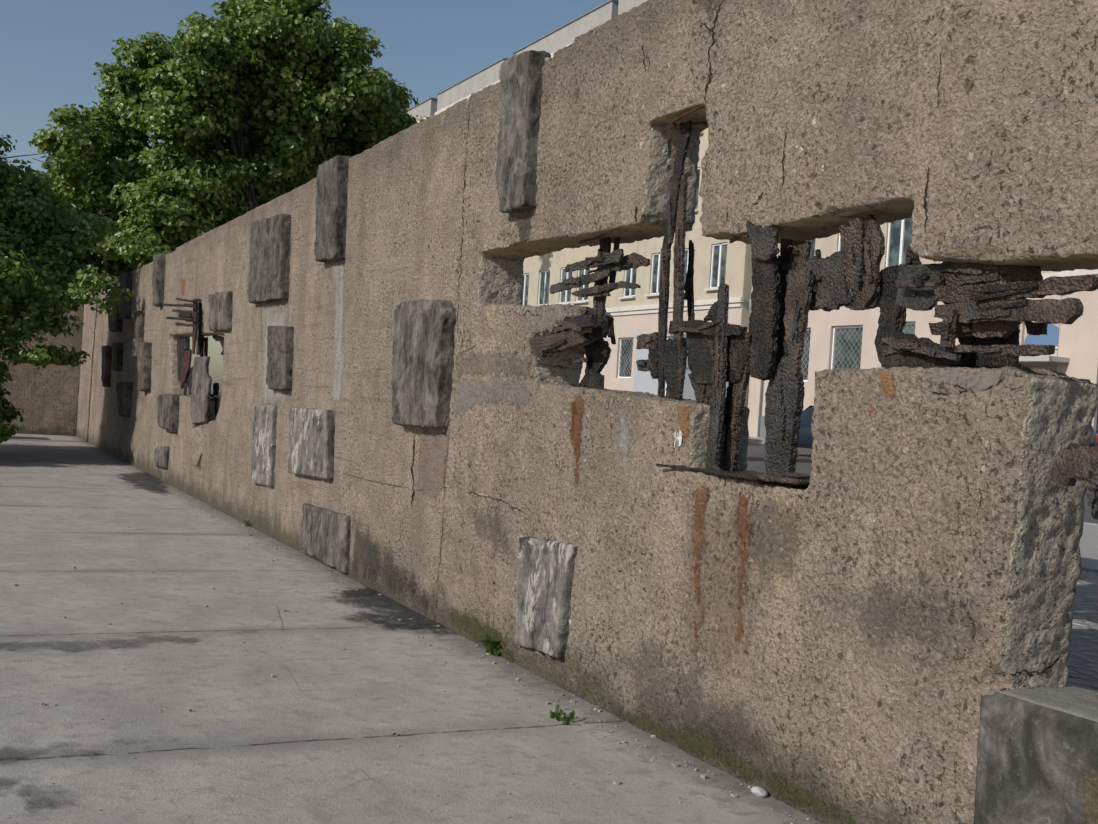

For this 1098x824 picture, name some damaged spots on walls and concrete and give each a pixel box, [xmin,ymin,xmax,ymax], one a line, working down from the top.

crack [700,2,722,103]
corrosion [570,395,584,486]
crack [344,432,525,569]
damp [332,516,436,611]
corrosion [688,486,709,659]
corrosion [730,493,753,641]
damp [353,619,436,632]